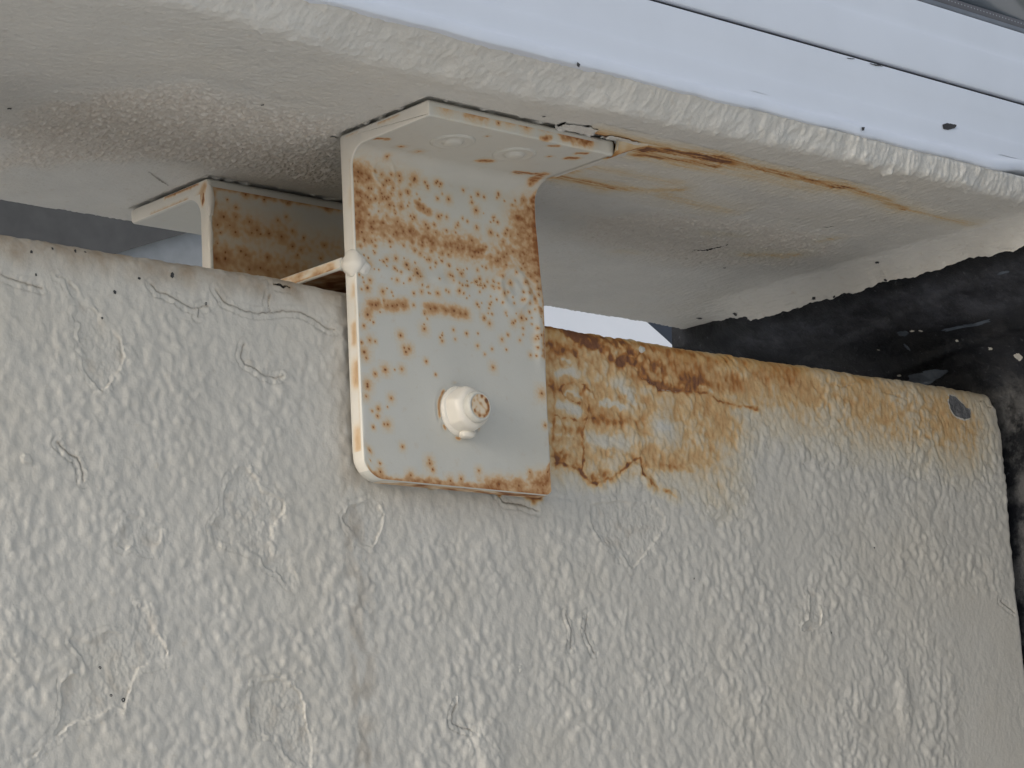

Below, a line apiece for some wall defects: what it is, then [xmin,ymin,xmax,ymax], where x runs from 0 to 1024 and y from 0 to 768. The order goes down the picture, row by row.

crack [145,277,340,384]
corrosion [150,106,1003,528]
spalling [947,394,971,421]